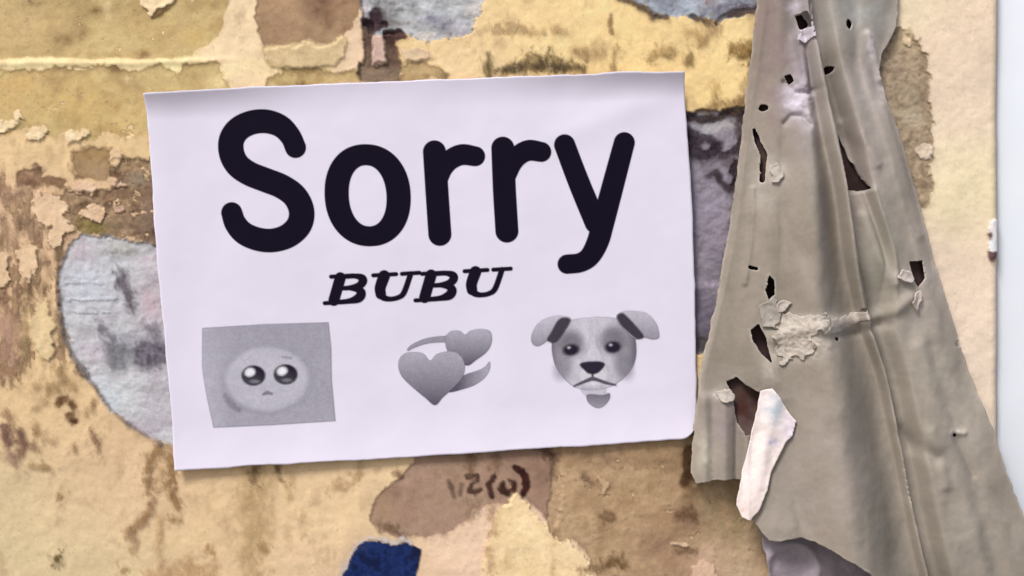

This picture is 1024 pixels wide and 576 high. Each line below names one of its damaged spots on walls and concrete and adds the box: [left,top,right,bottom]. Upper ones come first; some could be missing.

flaking render [879,27,935,208]
spalling [0,0,229,446]
spalling [686,106,745,354]
flaking render [988,219,997,262]
water stain [127,445,212,576]